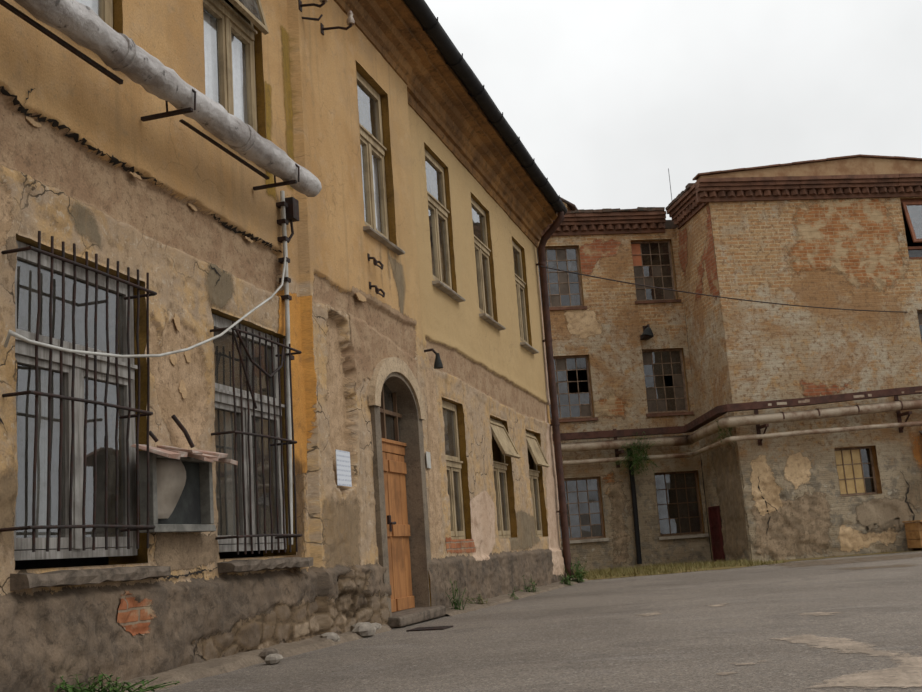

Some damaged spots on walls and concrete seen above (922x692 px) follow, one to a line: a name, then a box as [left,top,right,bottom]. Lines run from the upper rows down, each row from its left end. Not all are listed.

crack [0,86,163,186]
flaking render [0,88,358,494]
crack [758,477,777,534]
flaking render [750,452,898,561]
crack [900,471,917,521]
flaking render [117,590,156,636]